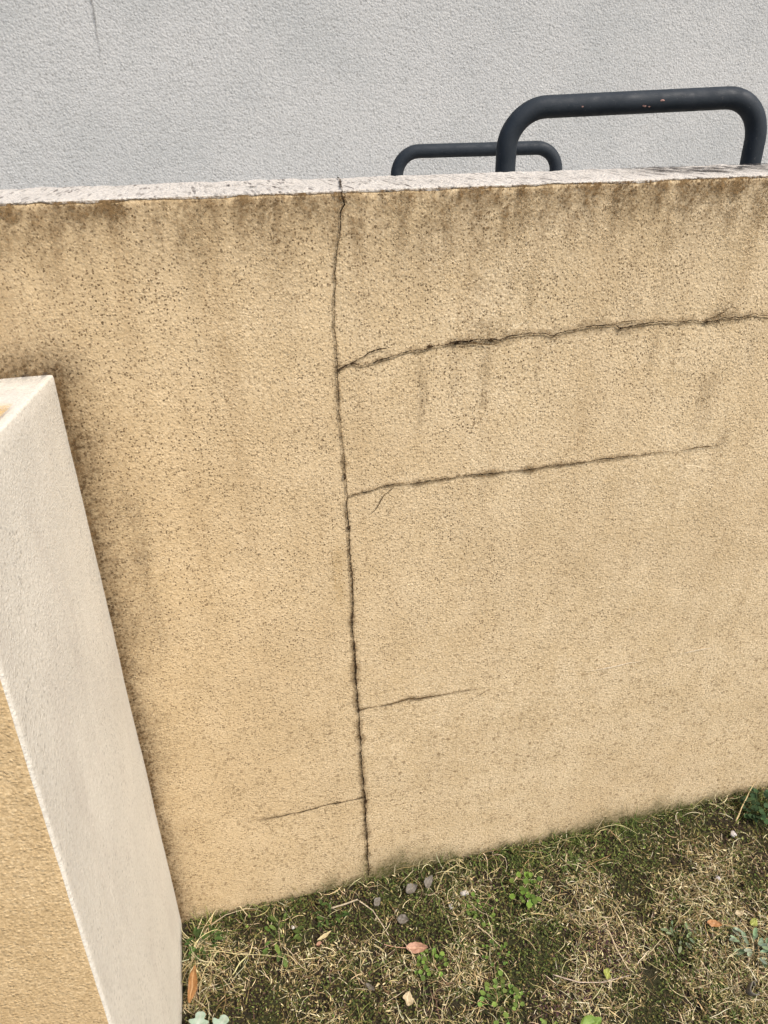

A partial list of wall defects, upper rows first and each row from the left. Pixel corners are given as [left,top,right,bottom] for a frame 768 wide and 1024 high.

damp [0,176,768,241]
crack [277,177,768,881]